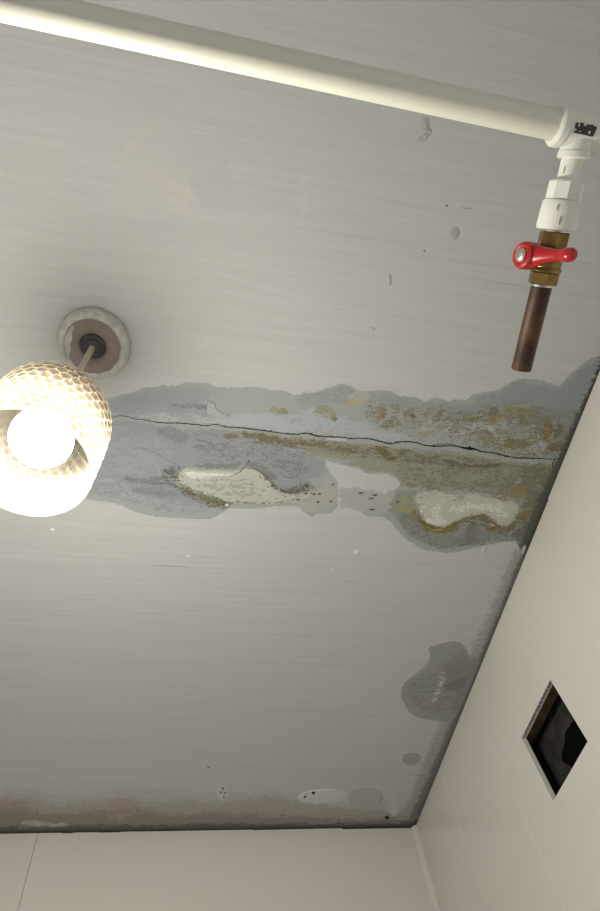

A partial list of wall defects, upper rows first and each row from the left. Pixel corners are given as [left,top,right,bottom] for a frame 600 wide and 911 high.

peeling [176,467,317,505]
leakage [62,356,600,554]
crack [104,398,561,469]
corrosion [346,398,578,462]
peeling [413,490,519,528]
leakage [401,641,483,722]